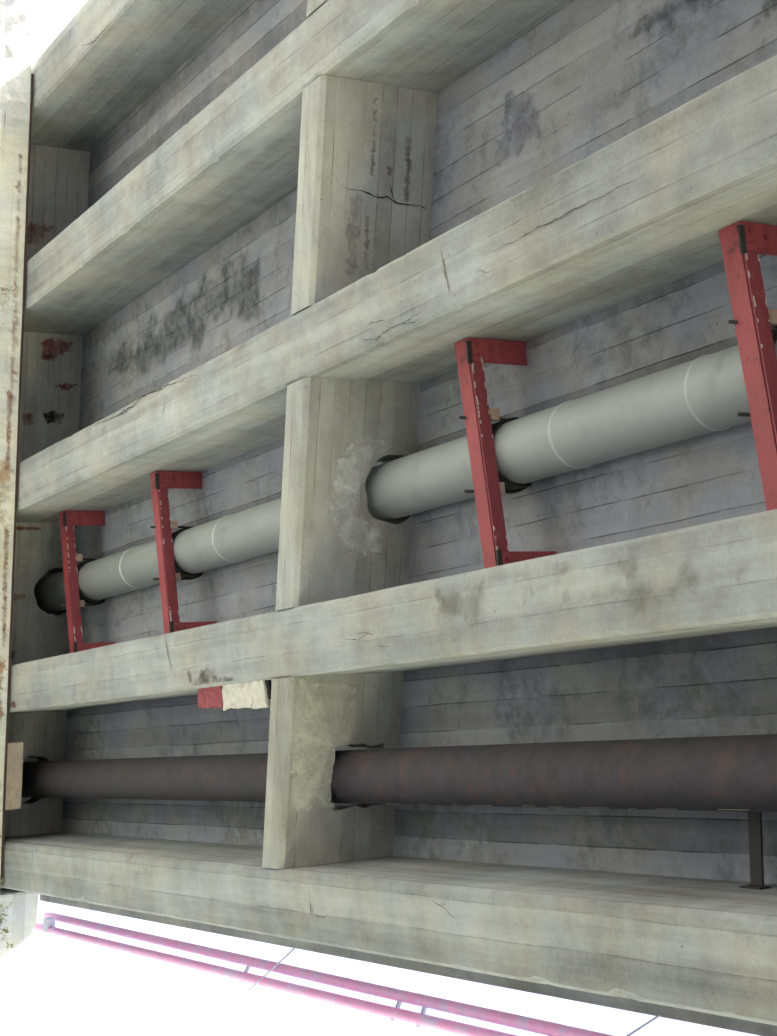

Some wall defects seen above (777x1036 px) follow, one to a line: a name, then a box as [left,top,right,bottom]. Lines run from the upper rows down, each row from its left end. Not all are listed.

crack [336,178,425,209]
leakage [113,263,259,373]
corrosion [40,338,73,361]
spalling [189,671,272,711]